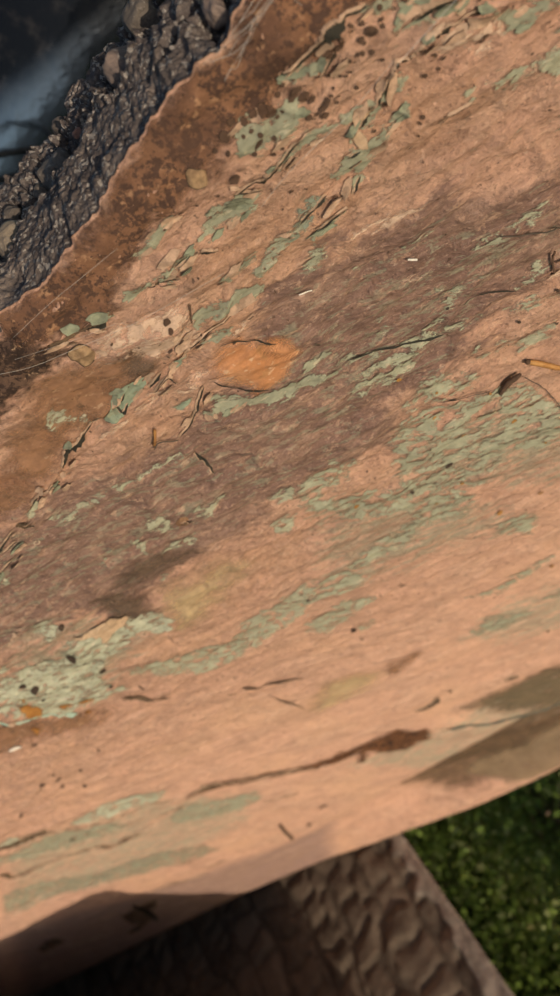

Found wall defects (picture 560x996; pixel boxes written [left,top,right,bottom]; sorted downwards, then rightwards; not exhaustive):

spalling [0,0,262,311]
peeling [228,72,411,189]
damp [0,0,408,511]
rust [218,339,299,389]
peeling [192,196,350,345]
peeling [203,259,500,421]
peeling [472,199,549,251]
peeling [502,260,560,312]
damp [97,550,194,621]
peeling [0,369,560,719]
rust [188,729,431,797]
damp [402,666,560,789]